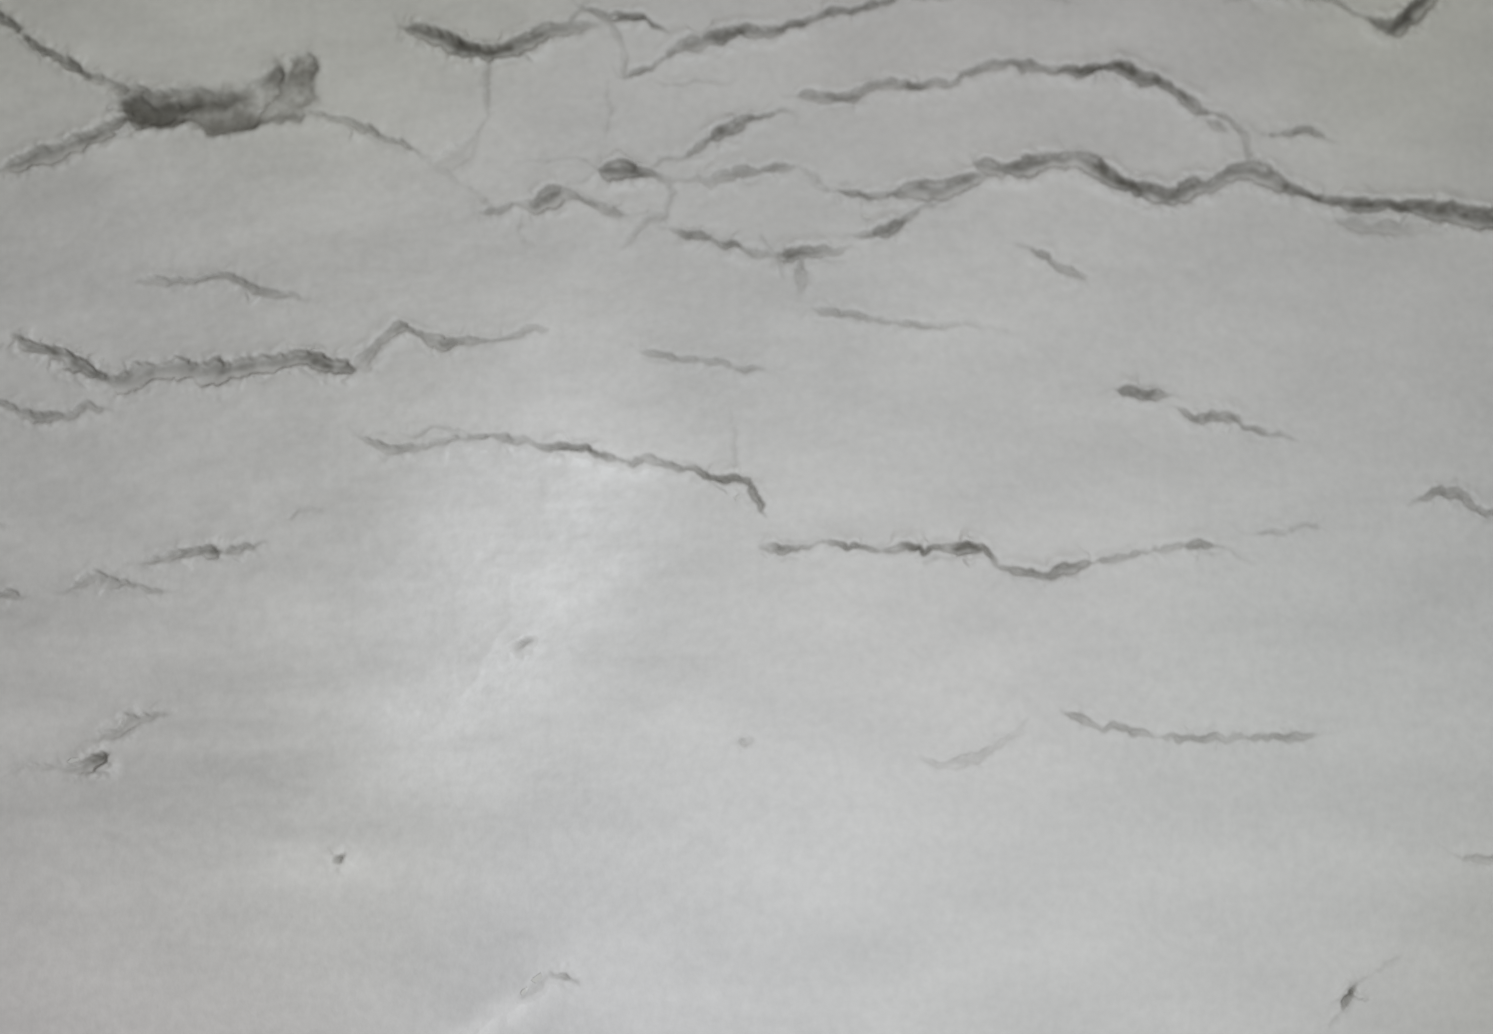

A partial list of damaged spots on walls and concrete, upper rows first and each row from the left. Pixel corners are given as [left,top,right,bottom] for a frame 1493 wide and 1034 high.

crack [0,0,1493,589]
crack [0,500,333,608]
crack [903,701,1351,774]